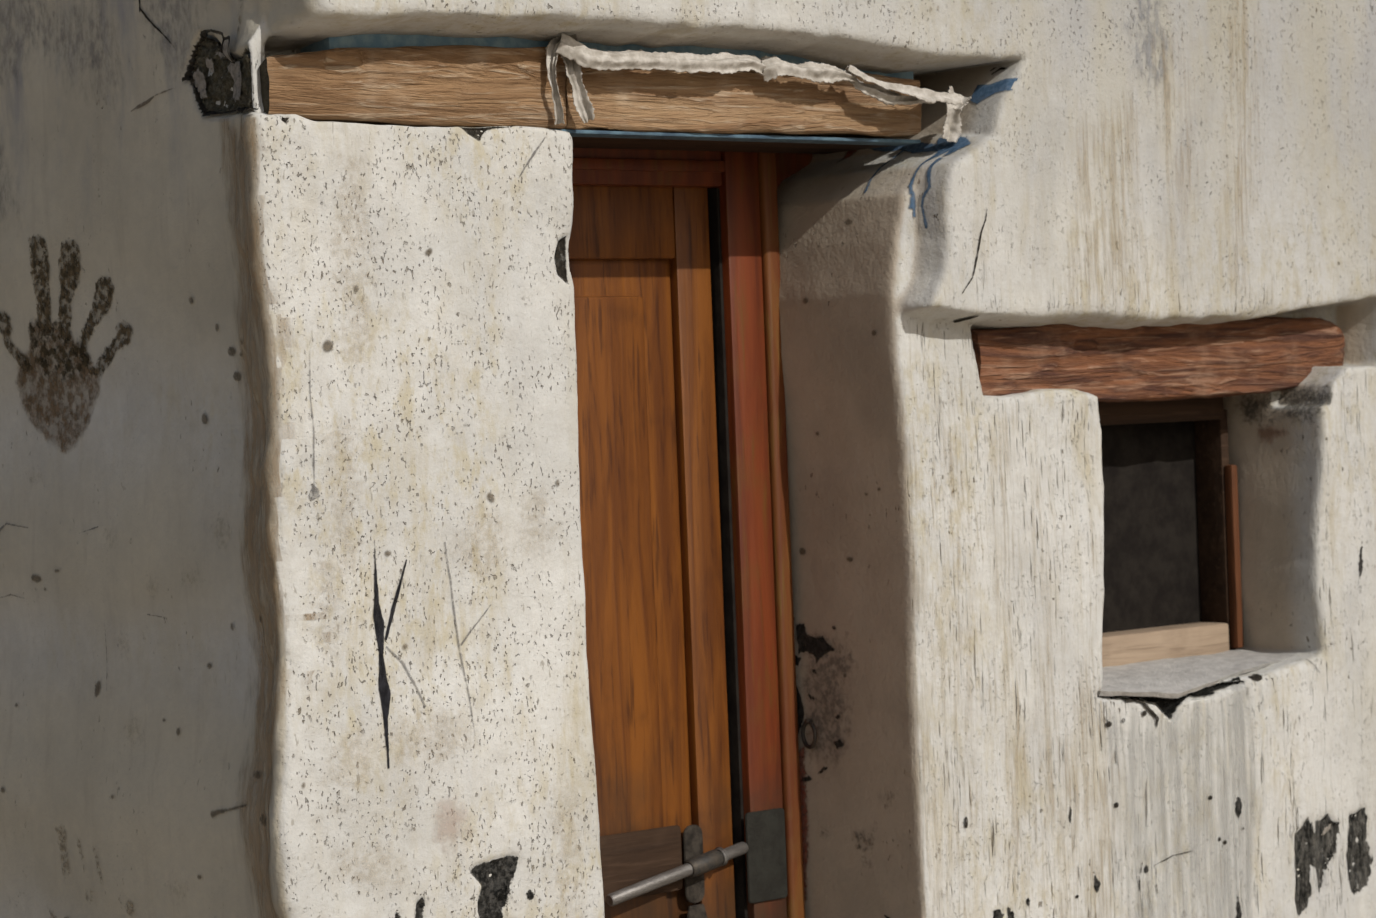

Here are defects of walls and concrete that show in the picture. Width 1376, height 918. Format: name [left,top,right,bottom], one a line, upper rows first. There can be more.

crack [139,0,171,43]
spalling [182,29,259,116]
spalling [395,897,425,918]
spalling [471,856,535,918]
spalling [993,898,1032,918]
spalling [1295,808,1373,915]